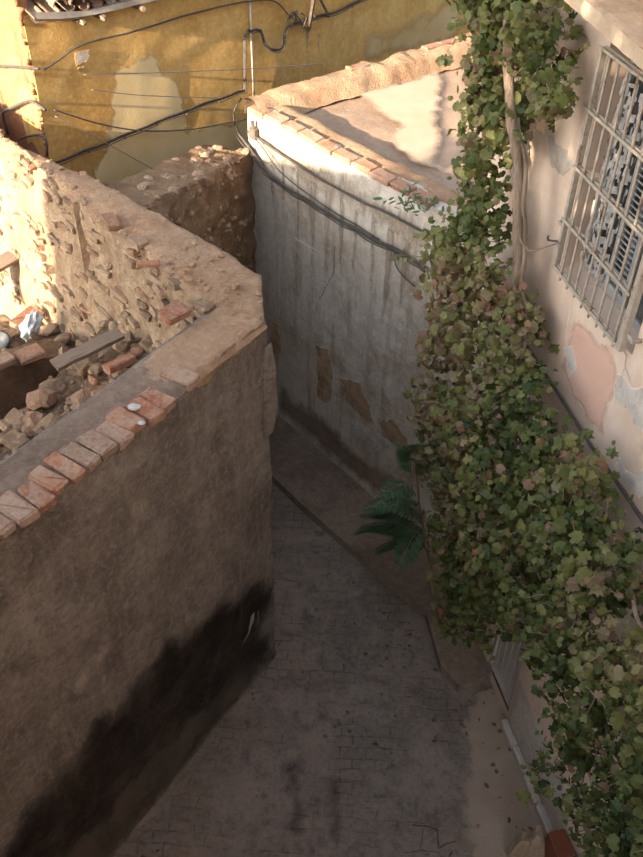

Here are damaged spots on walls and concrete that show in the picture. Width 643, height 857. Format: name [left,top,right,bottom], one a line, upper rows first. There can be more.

peeling [564,346,577,378]
peeling [315,343,409,449]
peeling [614,457,643,499]